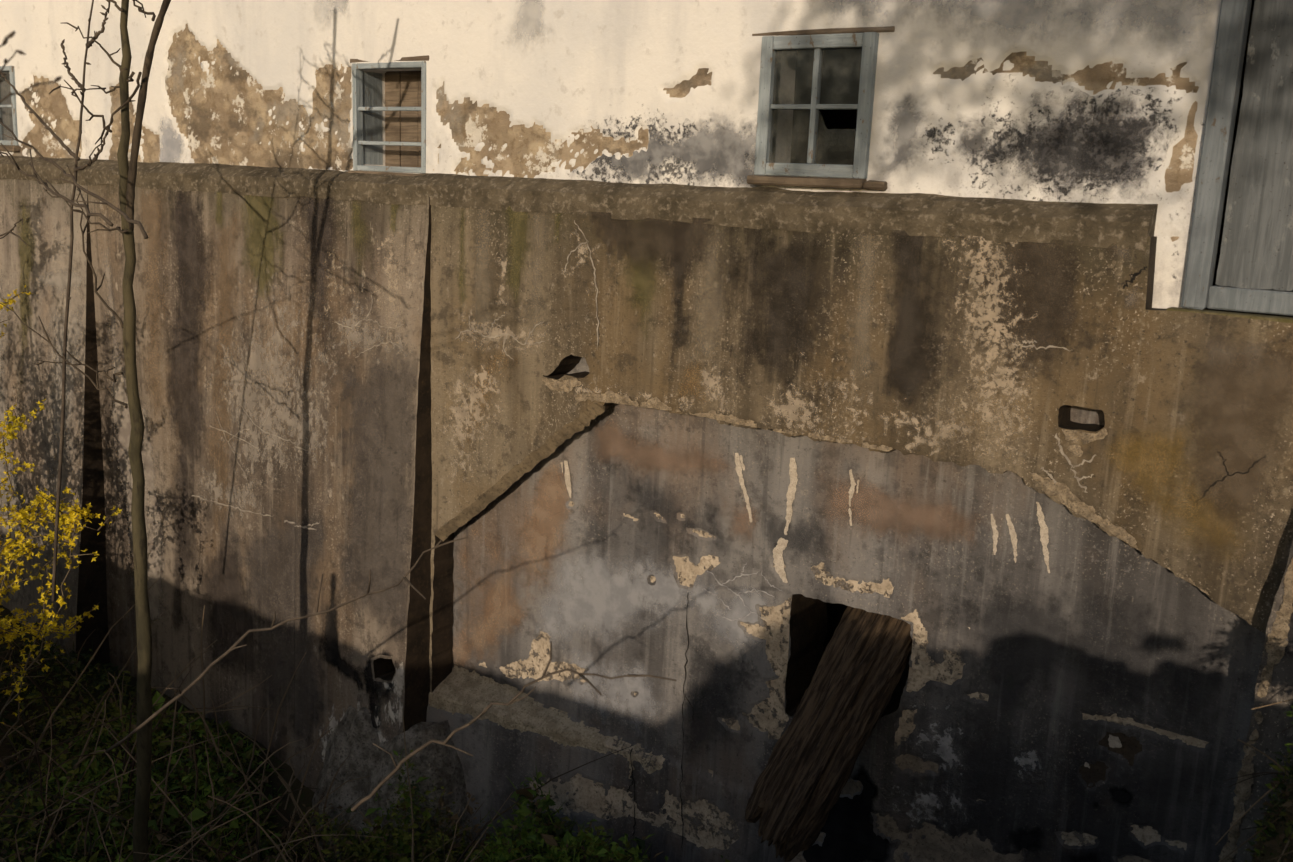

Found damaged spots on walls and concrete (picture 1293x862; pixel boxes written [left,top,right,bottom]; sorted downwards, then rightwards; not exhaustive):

peeling [12,75,82,158]
peeling [165,23,353,171]
peeling [433,81,649,178]
damp [572,113,756,185]
peeling [663,68,712,98]
damp [890,86,1179,201]
peeling [933,52,1199,192]
damp [105,193,421,628]
crack [1196,452,1266,505]
damp [769,523,810,583]
damp [207,521,404,762]
peeling [428,631,740,850]